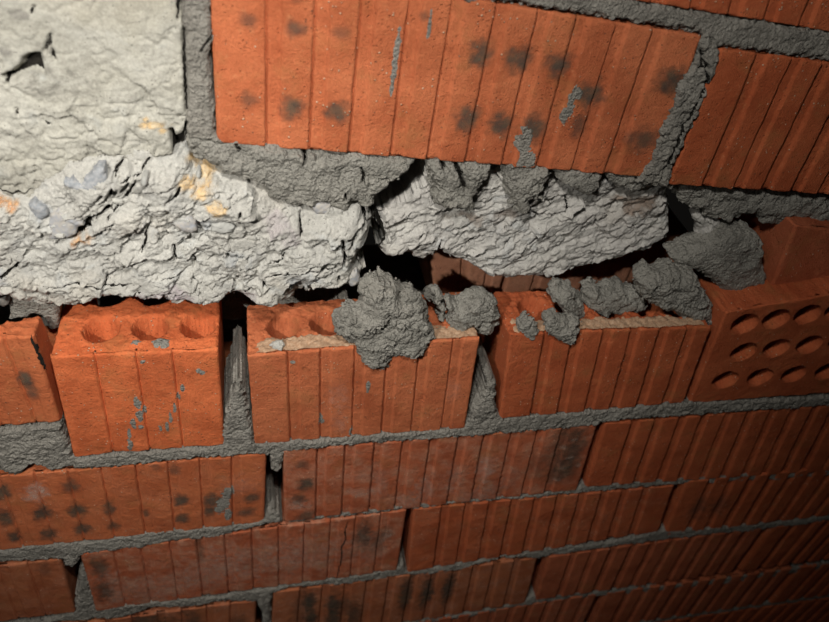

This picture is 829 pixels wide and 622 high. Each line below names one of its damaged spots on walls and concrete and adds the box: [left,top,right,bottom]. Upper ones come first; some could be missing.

spalling [5,33,56,82]
spalling [0,135,669,307]
spalling [689,208,720,234]
spalling [269,340,285,351]